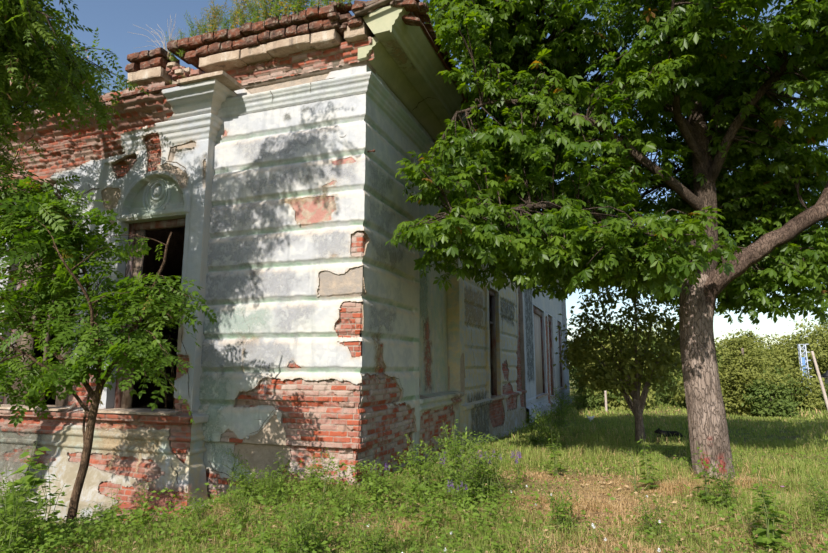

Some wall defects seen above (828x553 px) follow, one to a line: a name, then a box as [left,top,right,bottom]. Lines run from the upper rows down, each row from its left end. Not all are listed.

spalling [0,81,196,210]
peeling [282,180,337,226]
peeling [317,231,368,358]
spalling [0,374,193,465]
spalling [221,344,454,486]
spalling [68,452,188,523]
spalling [206,468,241,503]